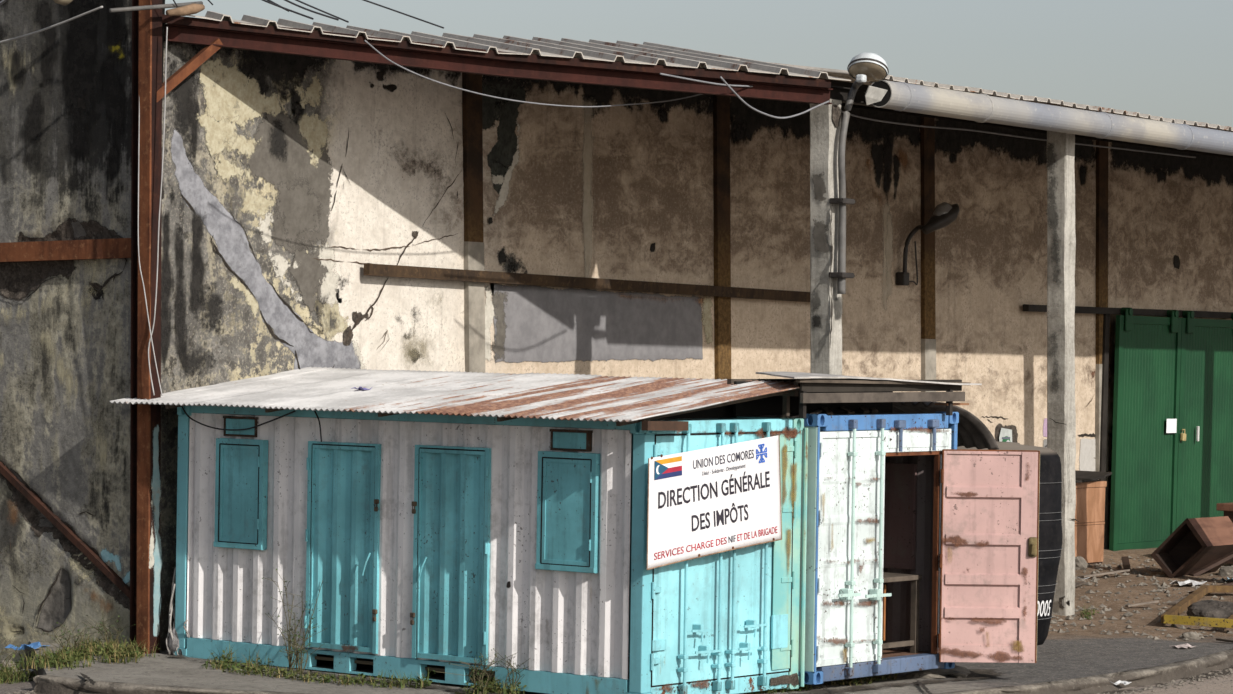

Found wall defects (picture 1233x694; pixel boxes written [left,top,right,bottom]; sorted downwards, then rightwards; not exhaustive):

spalling [0,260,76,299]
damp [0,0,129,197]
spalling [18,218,122,242]
flaking render [197,57,367,369]
crack [313,116,460,368]
peeling [482,79,526,224]
damp [730,96,810,144]
damp [841,104,1061,310]
damp [1074,136,1233,187]
rust [724,427,801,568]
rust [942,535,989,556]
rust [937,618,1023,662]